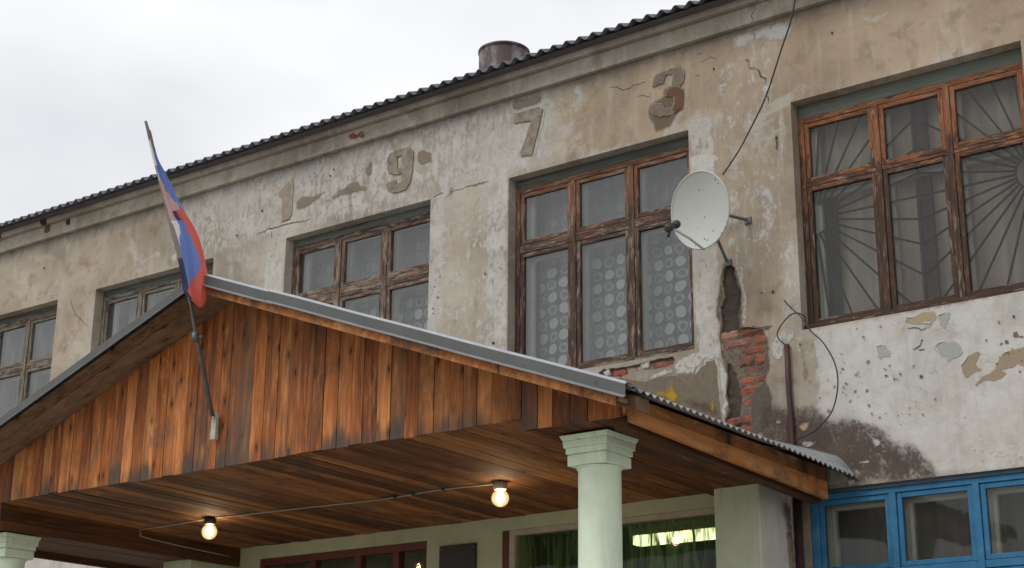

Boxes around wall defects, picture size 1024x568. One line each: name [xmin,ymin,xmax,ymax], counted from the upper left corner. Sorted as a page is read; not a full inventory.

crack [610,82,651,98]
crack [748,4,769,102]
crack [256,218,311,238]
flaking render [595,265,795,432]
peeling [905,311,1024,386]
leakage [750,338,935,482]